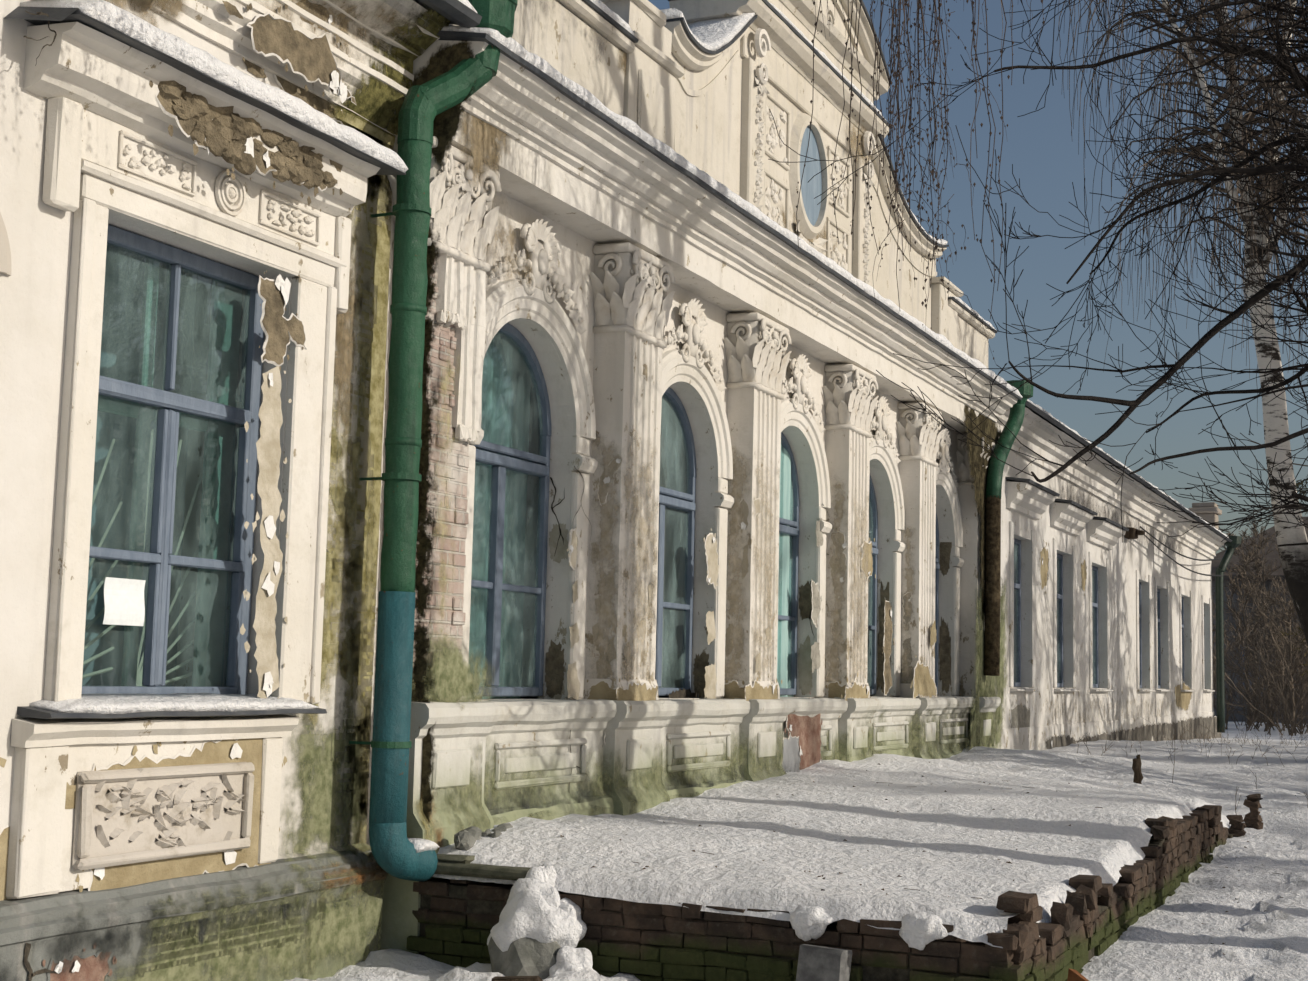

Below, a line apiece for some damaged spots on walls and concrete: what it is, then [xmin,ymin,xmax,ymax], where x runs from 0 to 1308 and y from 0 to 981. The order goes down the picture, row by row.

water stain [105,0,183,17]
spalling [149,80,344,212]
spalling [223,0,356,125]
water stain [335,103,398,151]
water stain [462,113,508,176]
spalling [240,270,307,699]
water stain [320,175,392,854]
spalling [545,497,782,701]
spalling [798,503,952,701]
spalling [76,738,280,895]
water stain [487,790,553,818]
water stain [53,890,307,968]